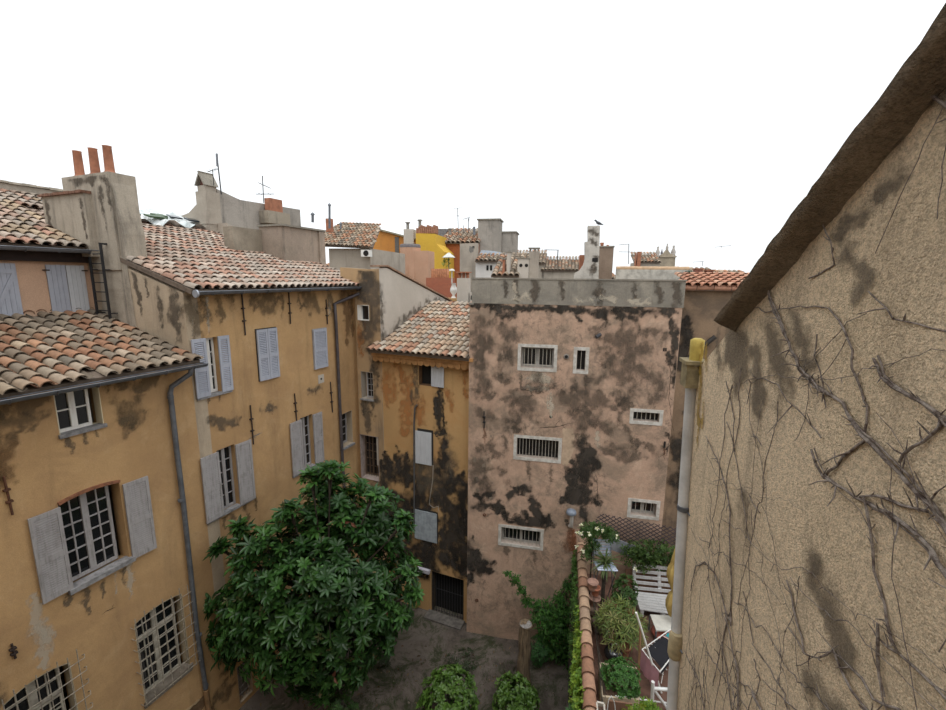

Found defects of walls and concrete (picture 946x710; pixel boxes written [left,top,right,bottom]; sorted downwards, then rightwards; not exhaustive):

damp [560,230,616,304]
damp [0,396,49,487]
damp [374,280,693,586]